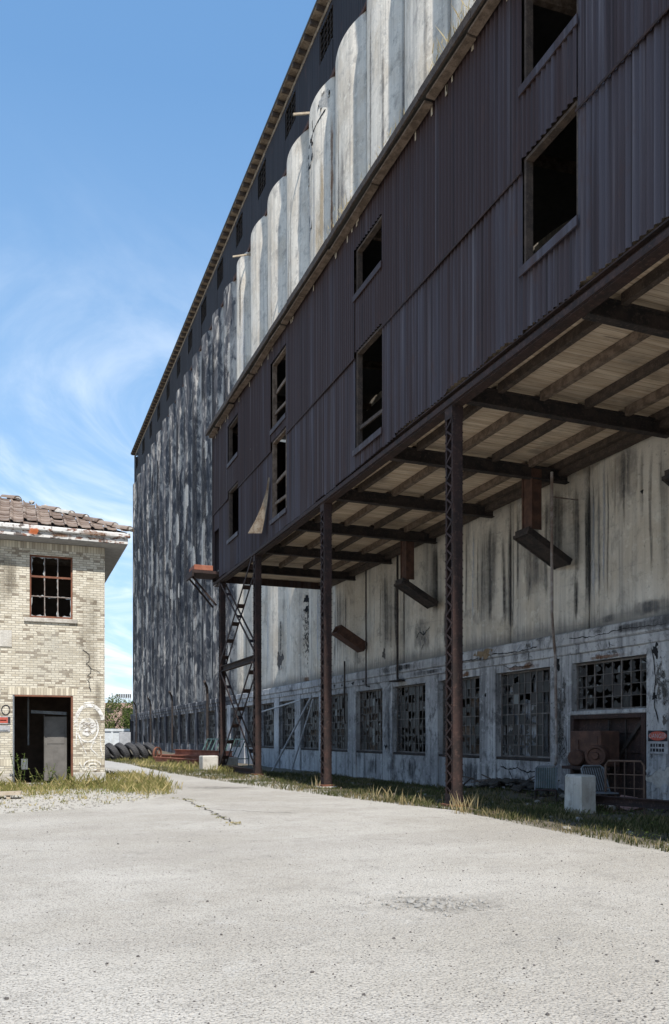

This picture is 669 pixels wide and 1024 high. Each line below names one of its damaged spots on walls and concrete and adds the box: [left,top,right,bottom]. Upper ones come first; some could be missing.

leakage [466,537,518,620]
leakage [575,487,609,614]
leakage [608,601,666,632]
peeling [651,642,668,725]